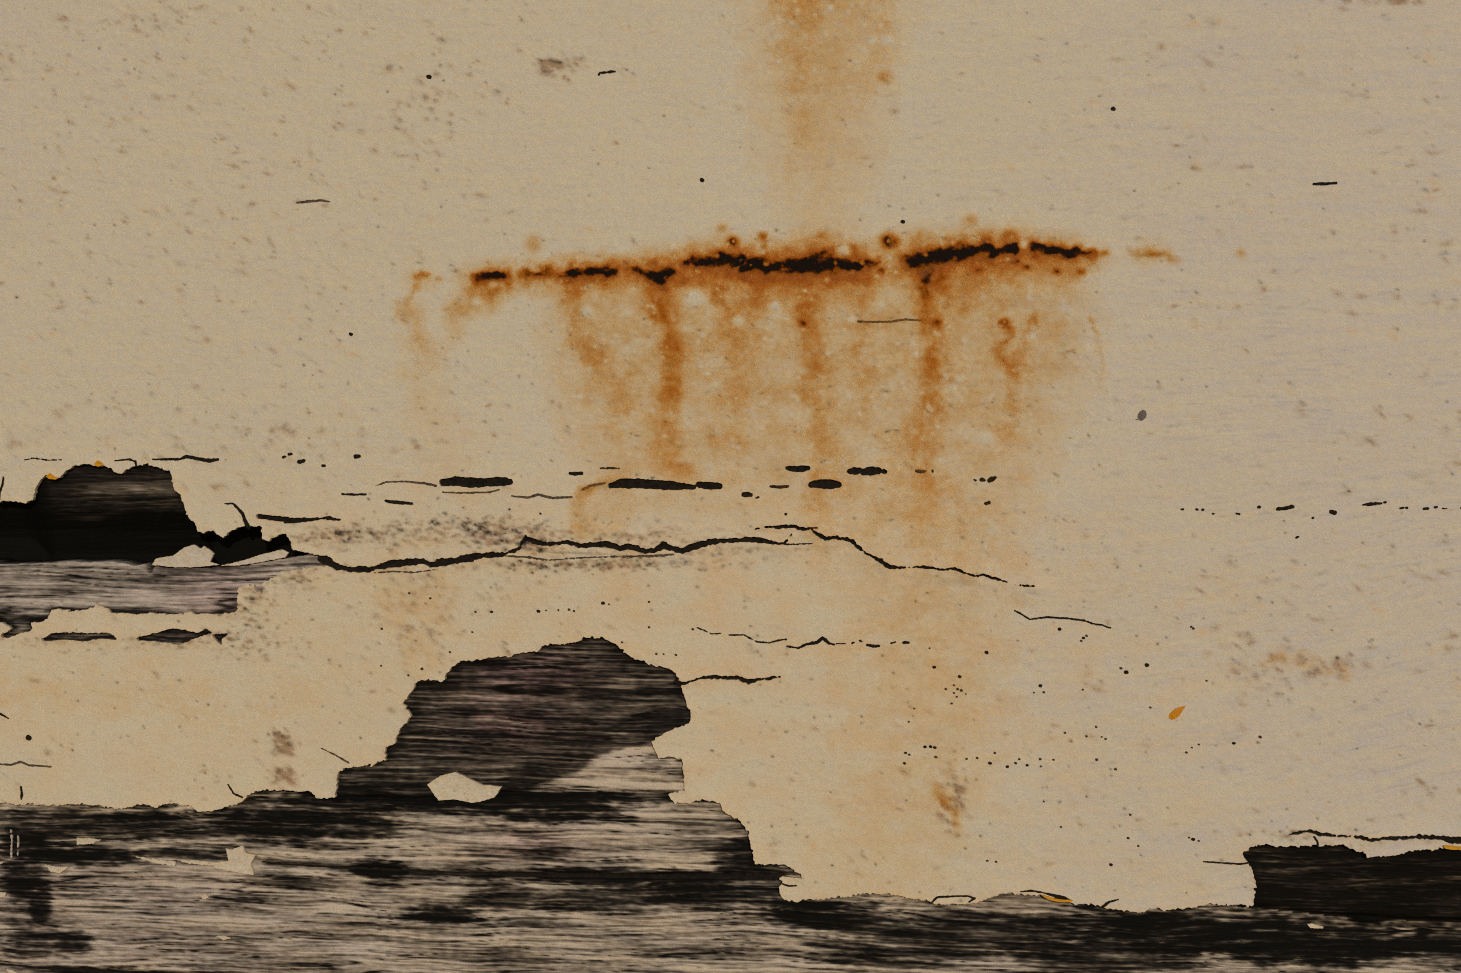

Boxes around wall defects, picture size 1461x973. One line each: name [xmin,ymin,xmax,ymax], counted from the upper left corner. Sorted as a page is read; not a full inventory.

rust [473,235,1096,300]
crack [0,457,62,498]
peeling [0,460,327,645]
crack [114,455,219,467]
crack [224,453,1111,629]
peeling [0,636,1461,973]